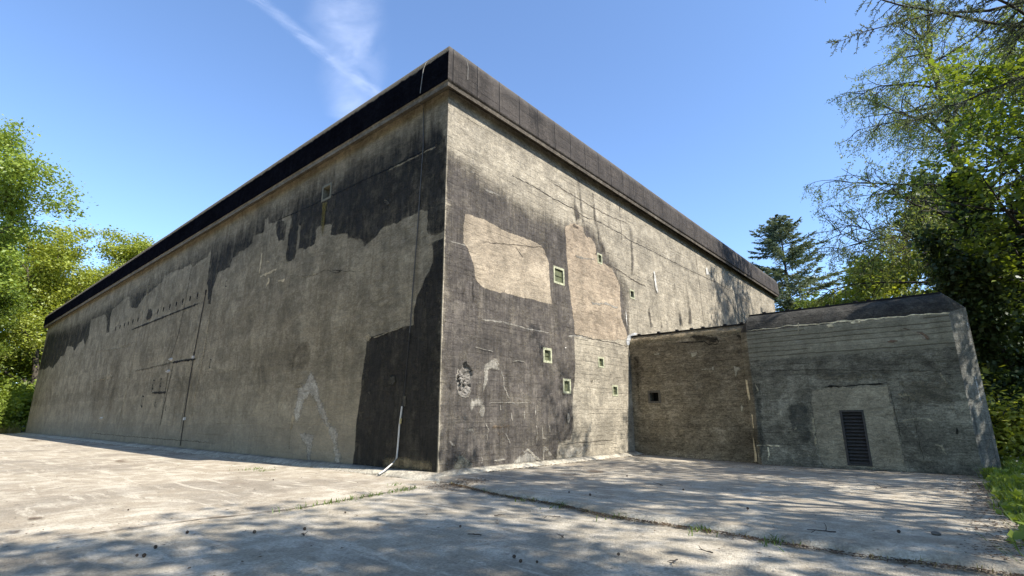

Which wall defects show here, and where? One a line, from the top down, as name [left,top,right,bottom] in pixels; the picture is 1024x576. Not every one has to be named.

leakage [574,193,605,250]
peeling [131,284,156,320]
peeling [185,125,948,473]
peeling [40,304,119,370]
efflorescence [291,373,341,463]
leakage [470,359,507,428]
crack [773,369,931,459]
leakage [494,449,544,463]